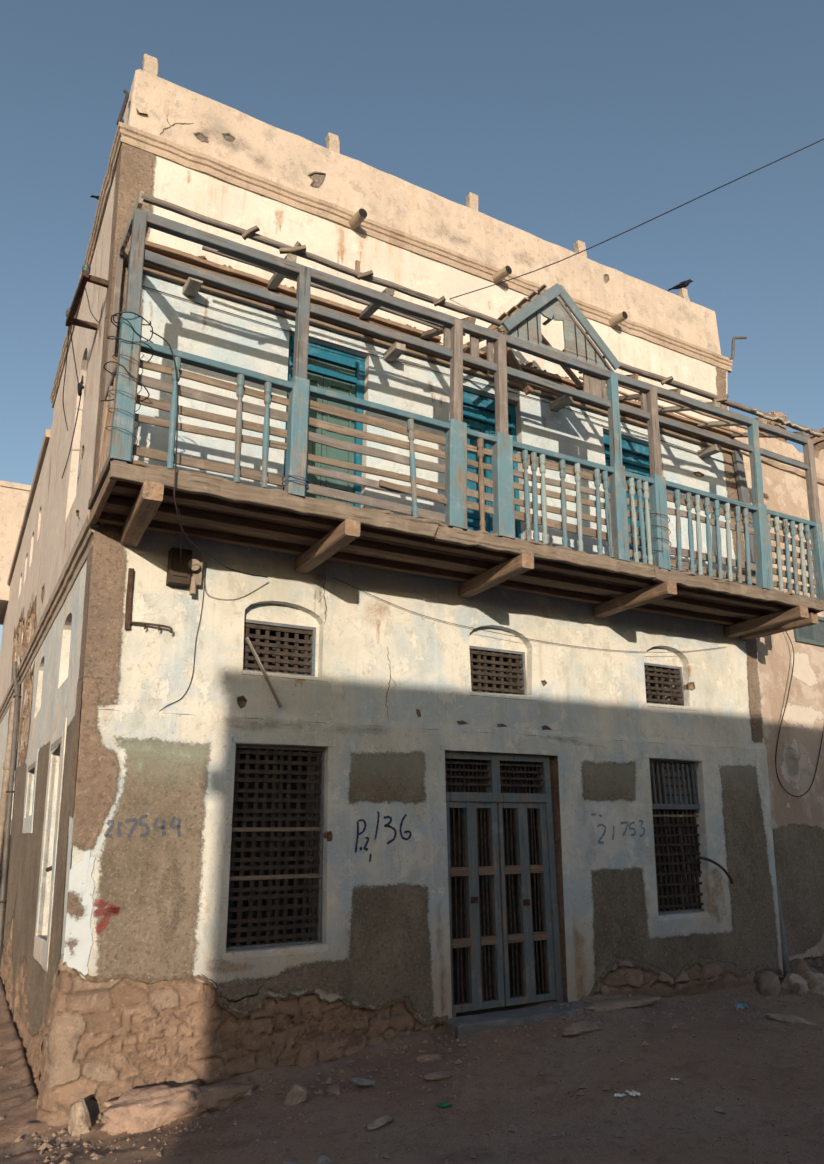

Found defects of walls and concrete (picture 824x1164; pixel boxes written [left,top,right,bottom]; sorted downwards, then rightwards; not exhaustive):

flaking render [7,585,44,771]
peeling [774,703,824,790]
peeling [791,651,819,687]
spalling [0,814,456,1126]